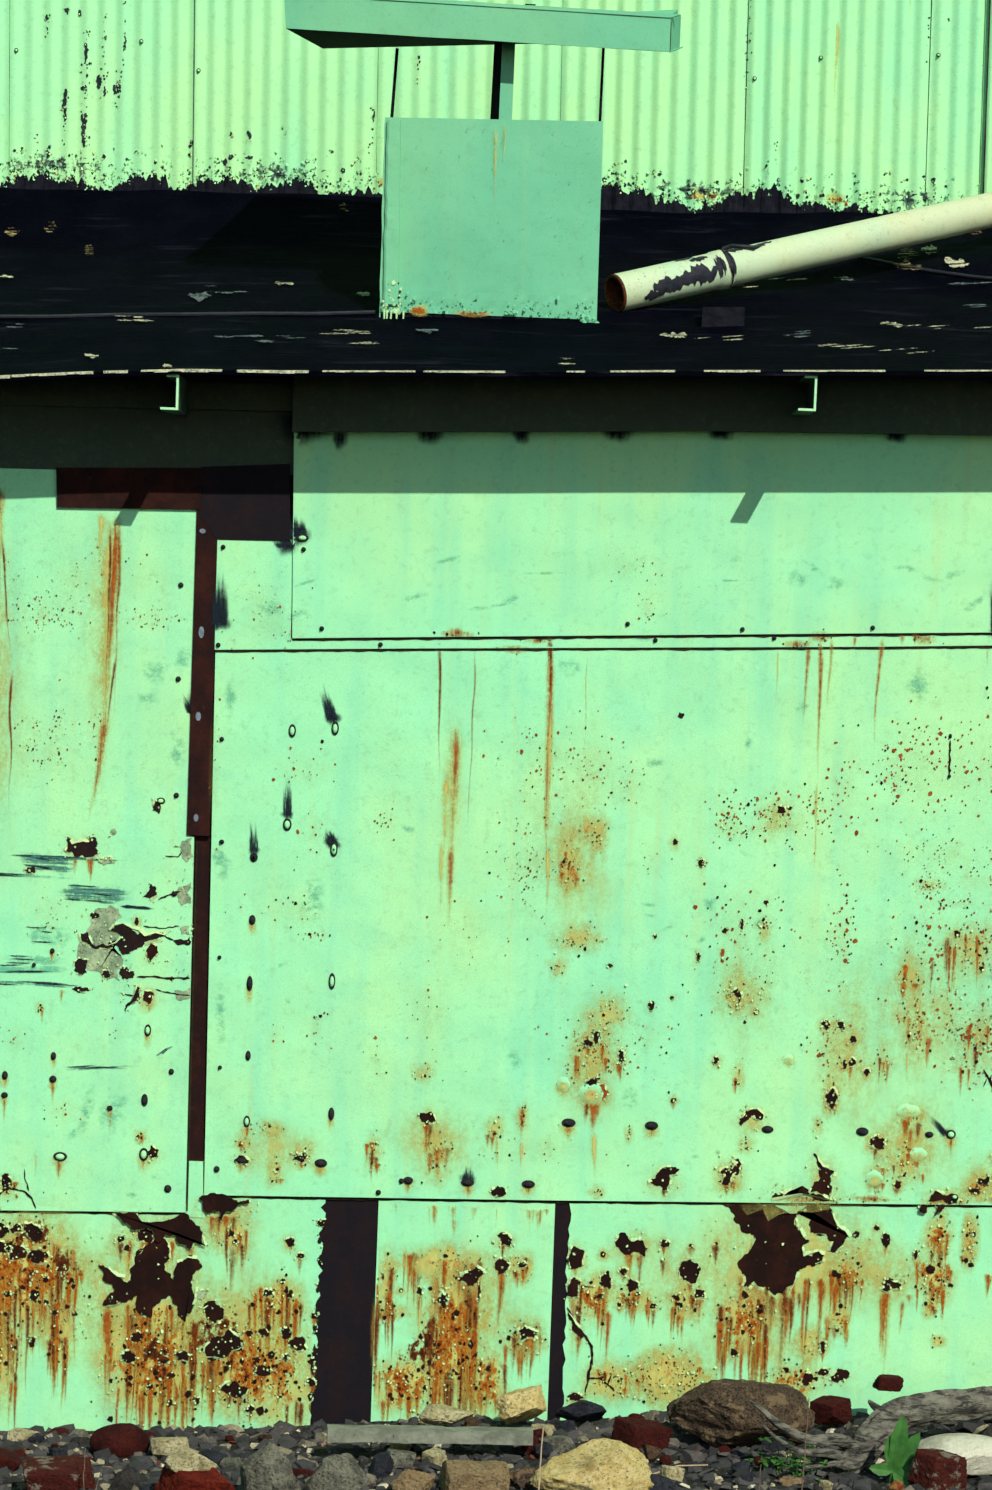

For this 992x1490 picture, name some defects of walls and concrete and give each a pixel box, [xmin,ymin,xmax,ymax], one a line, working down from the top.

rust [95,516,121,788]
rust [440,733,472,889]
rust [433,629,553,805]
peeling [27,839,194,1039]
rust [874,879,992,1100]
rust [796,1094,954,1203]
rust [0,1180,313,1430]
peeling [0,1192,328,1418]
rust [373,1235,549,1420]
peeling [564,1153,890,1387]
rust [569,1170,992,1404]
peeling [878,1249,919,1341]